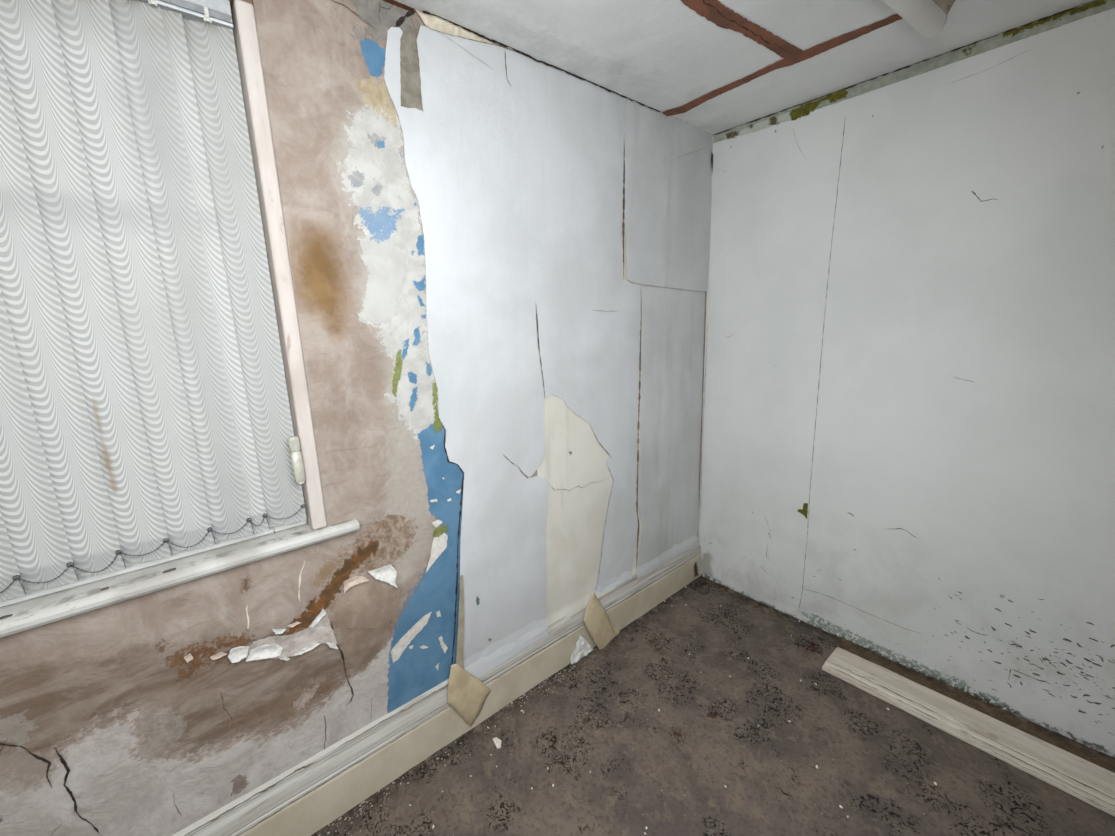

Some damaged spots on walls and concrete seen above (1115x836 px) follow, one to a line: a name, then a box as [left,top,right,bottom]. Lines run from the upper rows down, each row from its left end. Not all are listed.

leakage [292,227,347,335]
peeling [333,0,464,714]
flaking render [210,609,338,663]
leakage [227,671,338,729]
mould [701,565,1115,758]
crack [0,743,101,836]